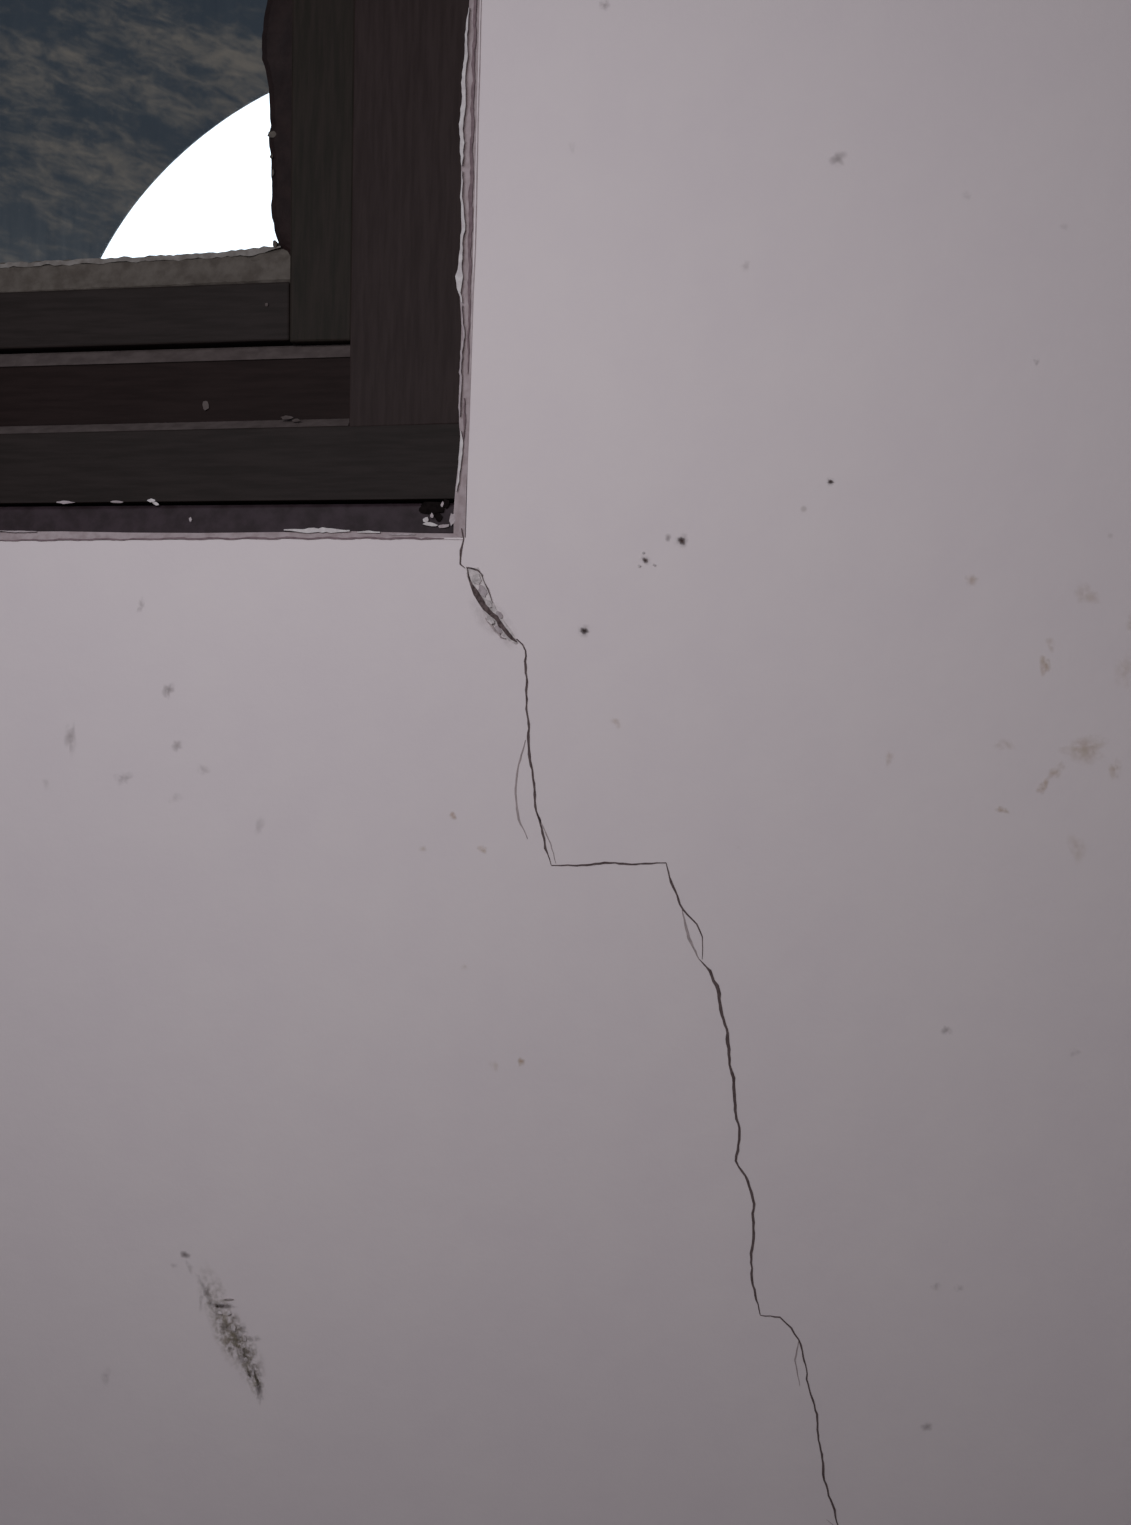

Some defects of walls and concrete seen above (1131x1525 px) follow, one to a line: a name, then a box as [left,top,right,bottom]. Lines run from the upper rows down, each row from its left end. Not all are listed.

crack [458,528,466,568]
crack [514,639,838,1525]